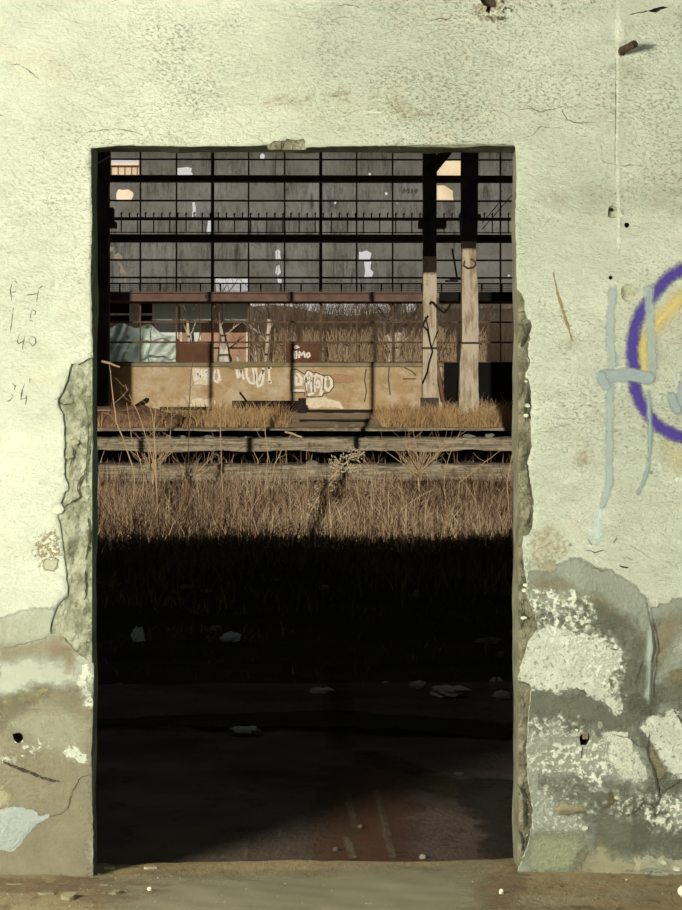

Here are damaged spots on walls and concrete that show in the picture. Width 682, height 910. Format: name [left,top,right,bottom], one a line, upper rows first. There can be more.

crack [514,106,595,138]
flaking render [43,358,94,710]
water stain [0,608,513,876]
peeling [517,291,682,865]
crack [613,599,682,816]
flaking render [632,854,682,875]